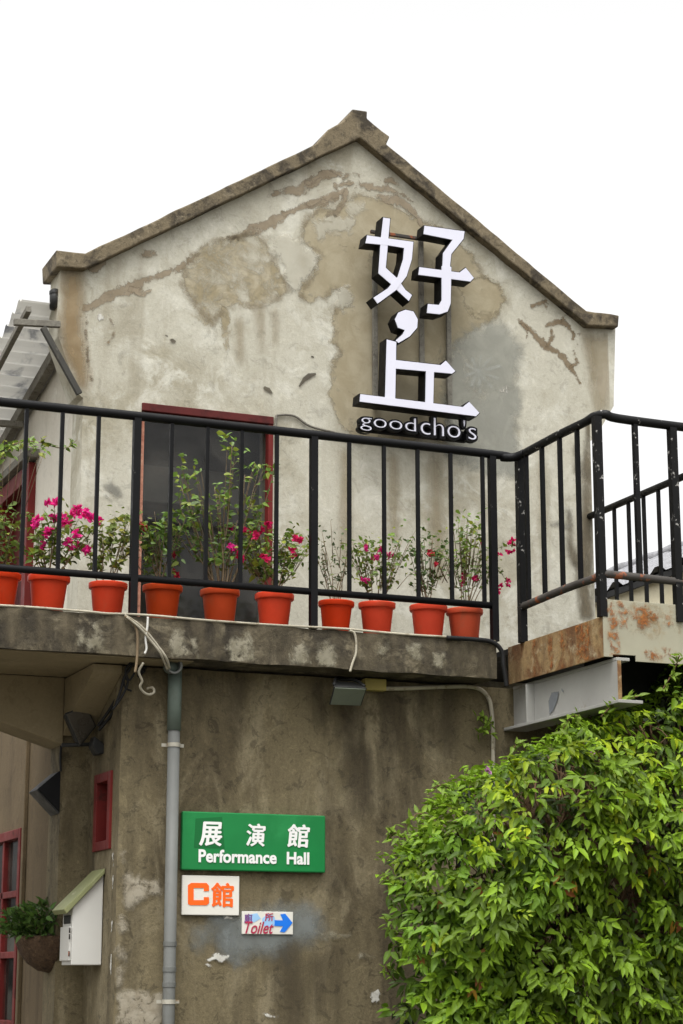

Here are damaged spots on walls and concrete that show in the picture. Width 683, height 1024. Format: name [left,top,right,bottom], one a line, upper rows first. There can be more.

flaking render [183,194,506,441]
corrosion [548,621,590,668]
corrosion [608,600,670,654]